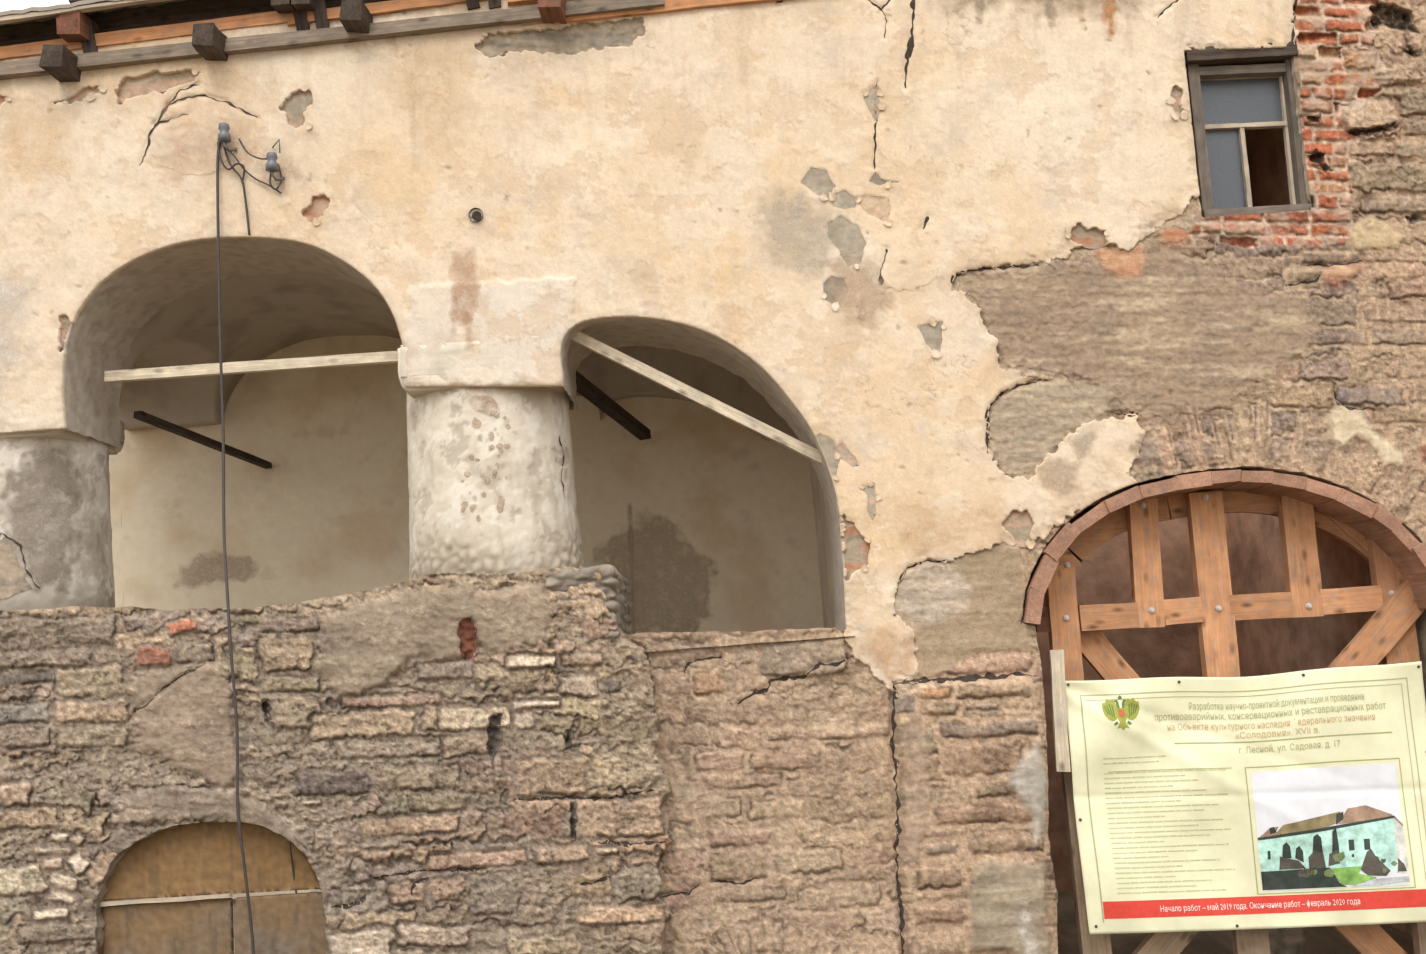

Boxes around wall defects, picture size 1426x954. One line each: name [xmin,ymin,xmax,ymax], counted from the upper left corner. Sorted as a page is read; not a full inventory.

flaking render [475,17,645,58]
spalling [1369,3,1424,57]
flaking render [67,68,198,104]
flaking render [280,85,313,130]
crack [868,0,915,169]
flaking render [801,167,899,311]
crack [879,249,888,285]
flaking render [1321,265,1361,285]
flaking render [816,433,860,481]
damp [182,555,252,585]
flaking render [842,515,871,581]
flaking render [1002,510,1036,549]